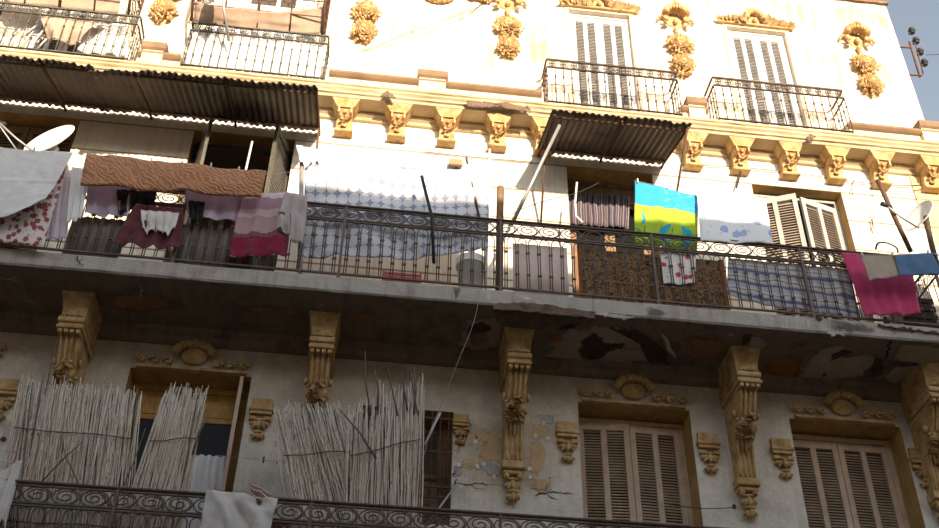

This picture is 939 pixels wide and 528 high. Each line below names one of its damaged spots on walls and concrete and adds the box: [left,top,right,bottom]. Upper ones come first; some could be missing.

peeling [457,302,669,365]
peeling [798,331,916,384]